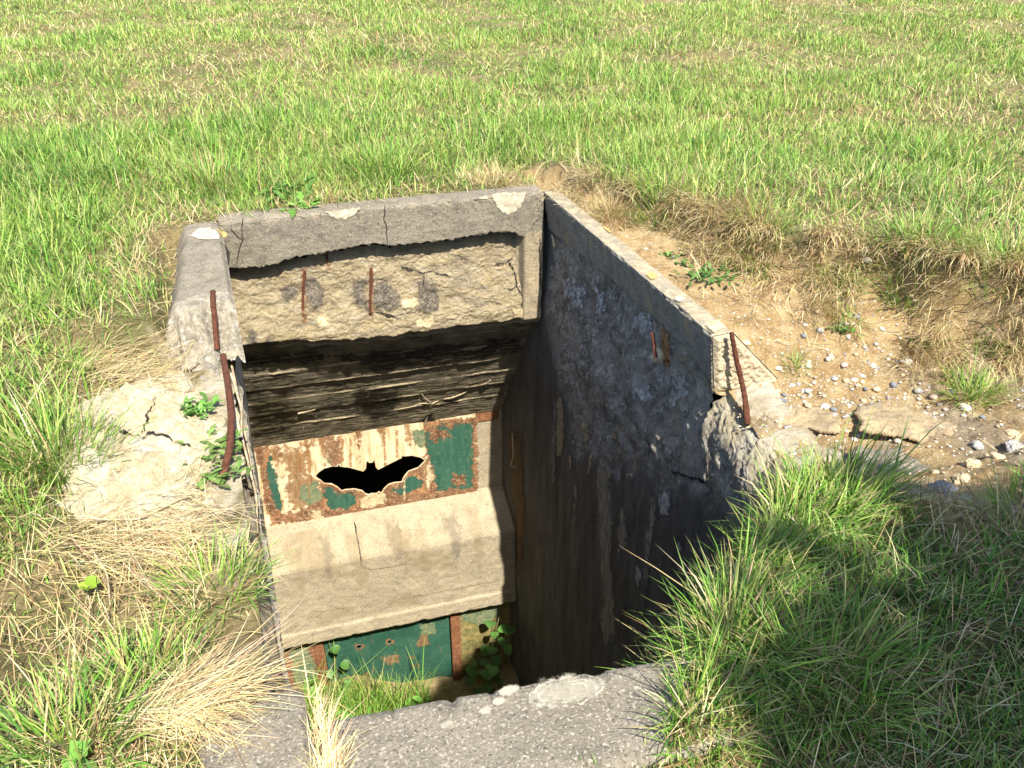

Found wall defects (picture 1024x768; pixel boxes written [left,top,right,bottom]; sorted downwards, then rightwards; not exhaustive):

spalling [480,192,526,215]
crack [282,205,472,285]
damp [279,277,324,308]
spalling [230,232,523,349]
damp [352,278,402,312]
damp [415,279,440,313]
spalling [696,320,847,533]
spalling [49,289,318,697]
rust [254,416,479,526]
rust [382,639,399,665]